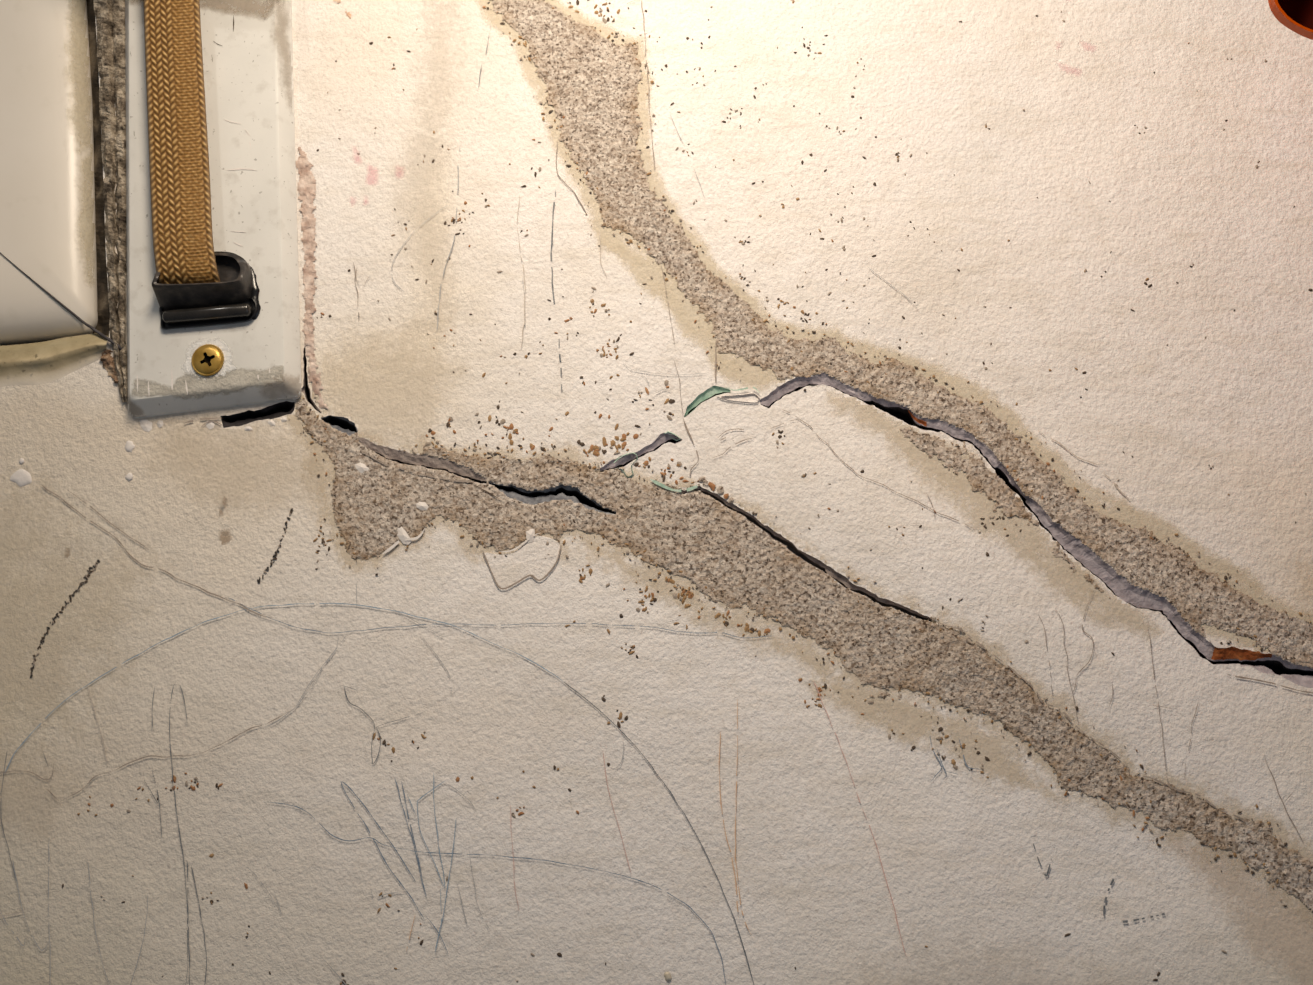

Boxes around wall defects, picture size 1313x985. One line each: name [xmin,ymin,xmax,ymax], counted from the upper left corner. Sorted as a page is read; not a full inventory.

spalling [249,266,261,320]
flaking render [268,147,1313,912]
crack [321,266,1313,820]
flaking render [480,0,1313,668]
crack [1264,755,1303,841]